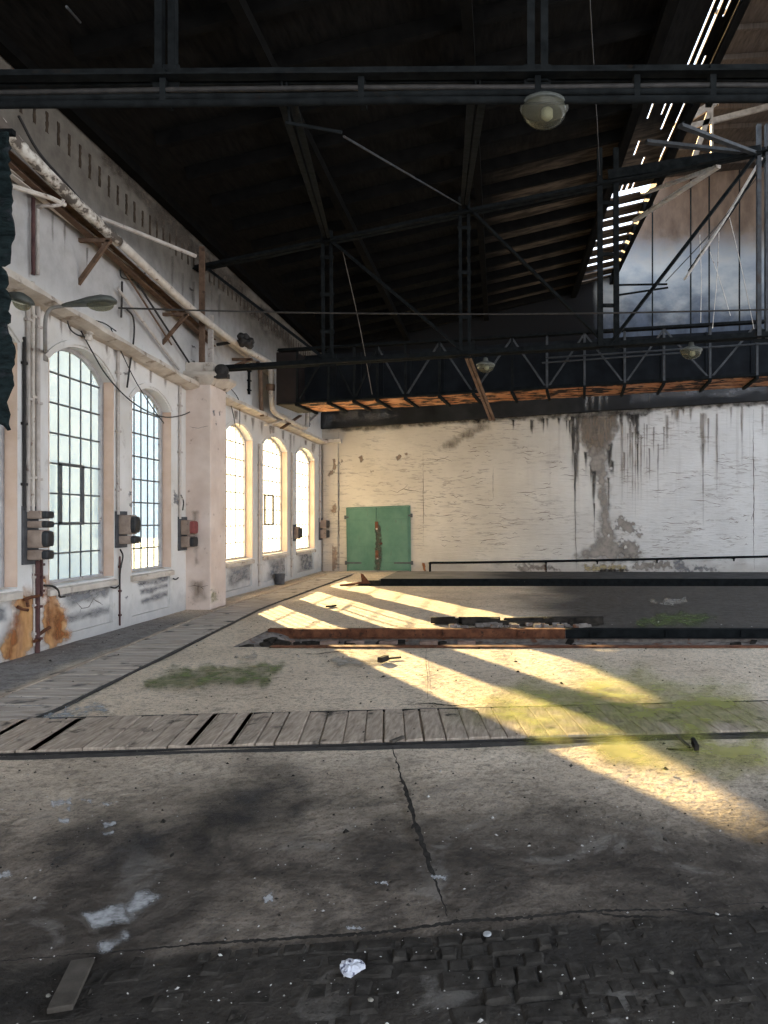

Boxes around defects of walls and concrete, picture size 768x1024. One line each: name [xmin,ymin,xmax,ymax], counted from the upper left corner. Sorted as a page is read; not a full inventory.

damp [324,387,768,516]
spalling [356,415,768,586]
rust [0,578,70,660]
crack [0,747,768,961]